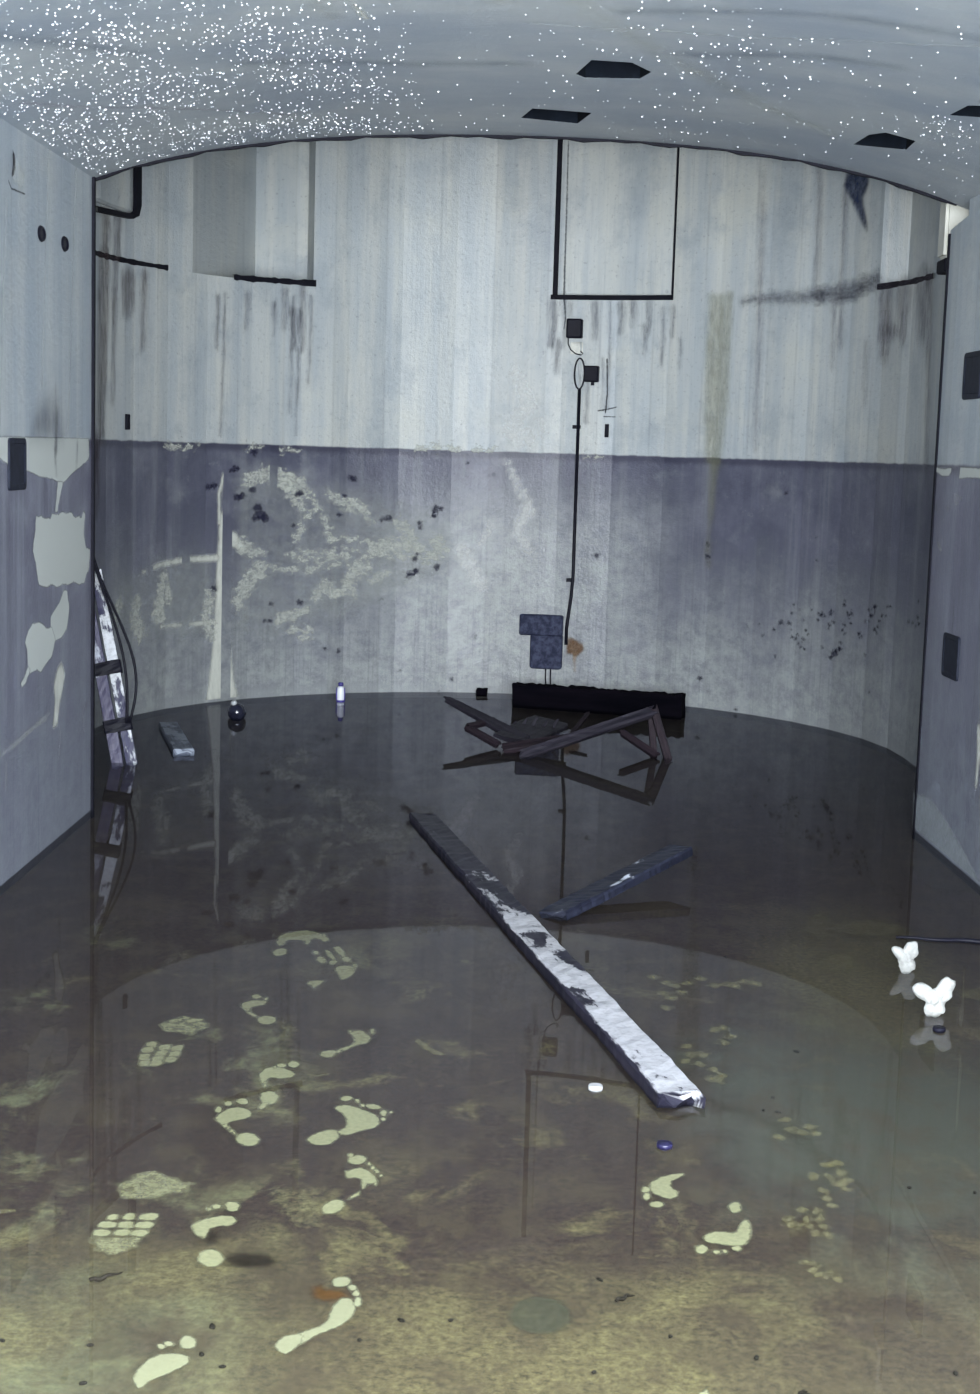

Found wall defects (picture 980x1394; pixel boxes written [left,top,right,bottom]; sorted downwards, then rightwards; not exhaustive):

peeling [0,436,90,687]
peeling [114,570,172,646]
peeling [232,447,450,641]
corrosion [567,639,583,655]